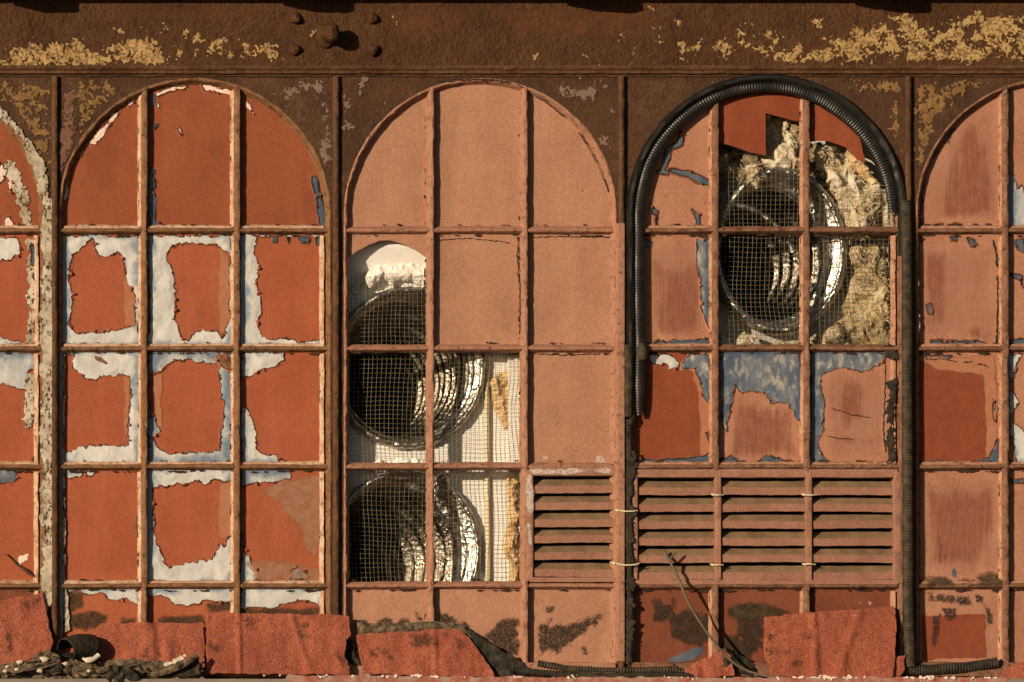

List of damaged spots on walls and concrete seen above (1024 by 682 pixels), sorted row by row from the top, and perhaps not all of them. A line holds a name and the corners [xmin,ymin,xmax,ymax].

peeling [0,23,284,65]
peeling [677,4,1024,65]
peeling [849,78,902,146]
peeling [913,80,990,166]
peeling [655,129,709,186]
peeling [690,208,701,225]
peeling [0,79,326,614]
peeling [647,237,899,464]
leakage [538,607,602,655]
leakage [653,598,709,646]
leakage [722,603,788,658]
leakage [928,593,992,646]